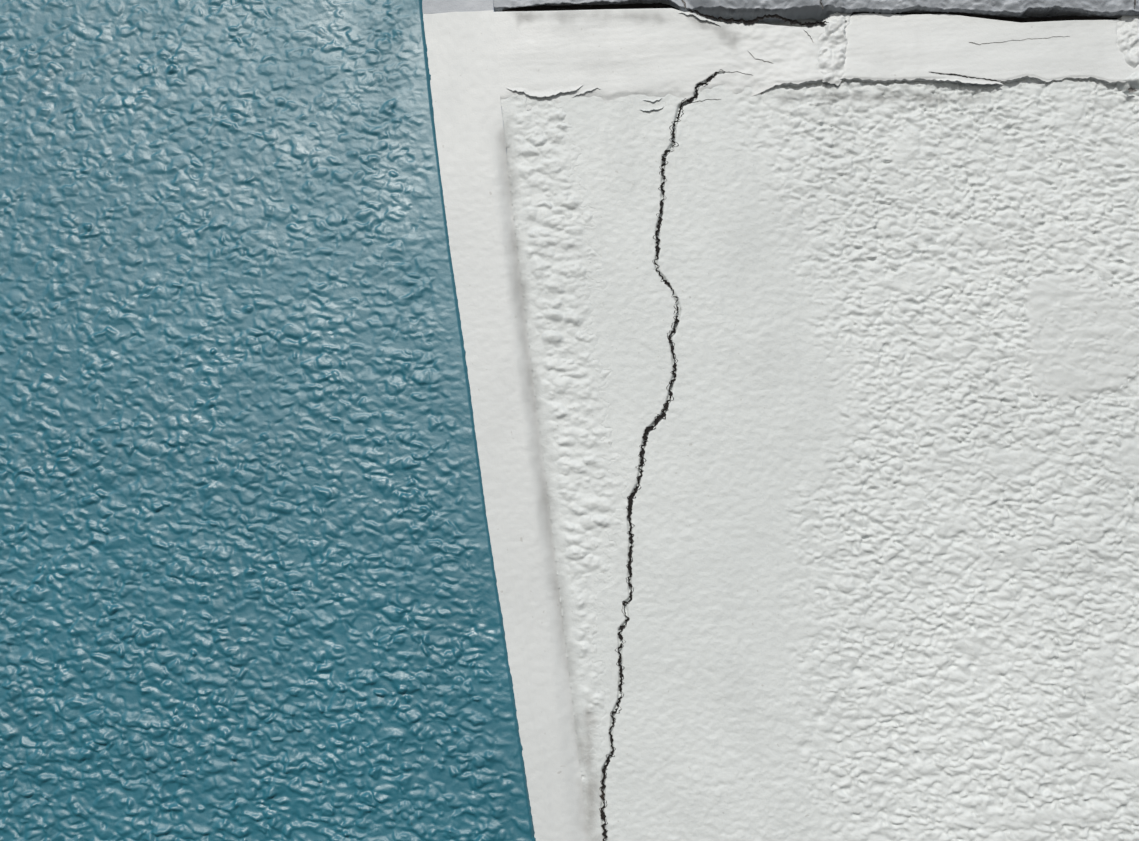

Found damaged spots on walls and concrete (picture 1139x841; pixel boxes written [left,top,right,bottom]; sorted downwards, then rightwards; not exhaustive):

crack [682,0,846,43]
crack [599,53,769,841]